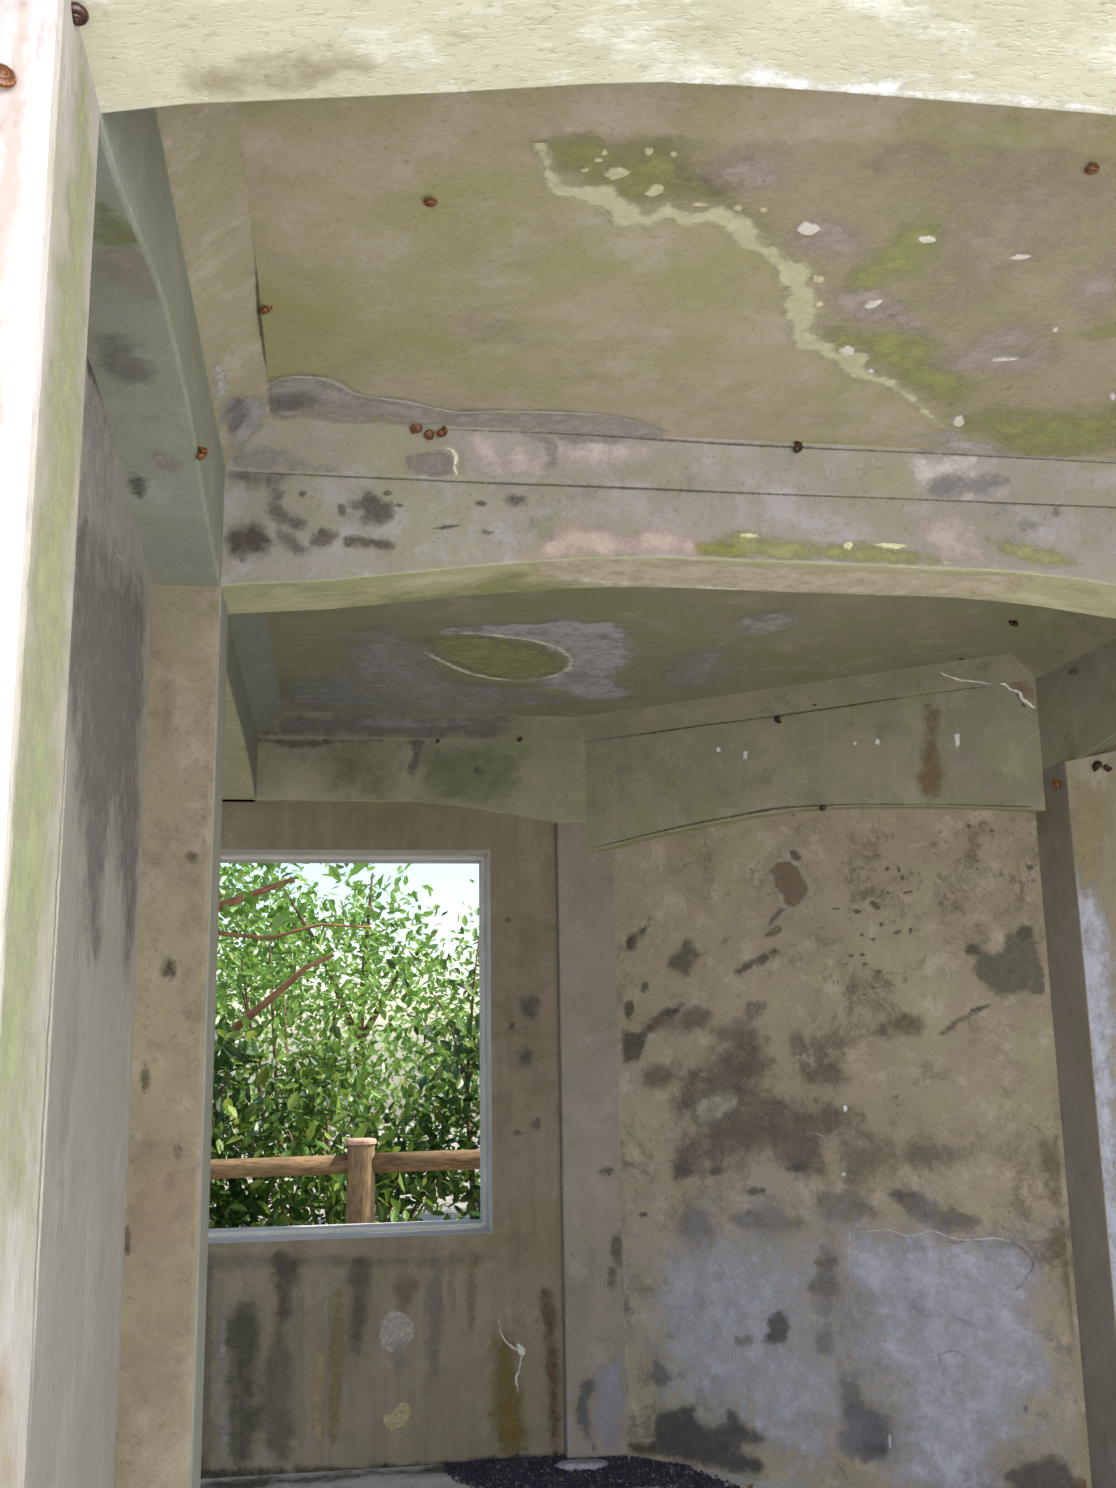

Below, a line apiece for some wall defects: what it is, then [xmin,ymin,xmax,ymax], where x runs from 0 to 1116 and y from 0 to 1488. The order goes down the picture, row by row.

leakage [87,337,149,382]
peeling [532,138,1116,456]
leakage [215,365,664,561]
leakage [69,400,144,959]
peeling [418,619,634,699]
leakage [941,927,1044,1035]
leakage [658,1002,850,1177]
leakage [201,1253,530,1479]
leakage [577,1365,623,1448]
leakage [627,1187,1076,1488]